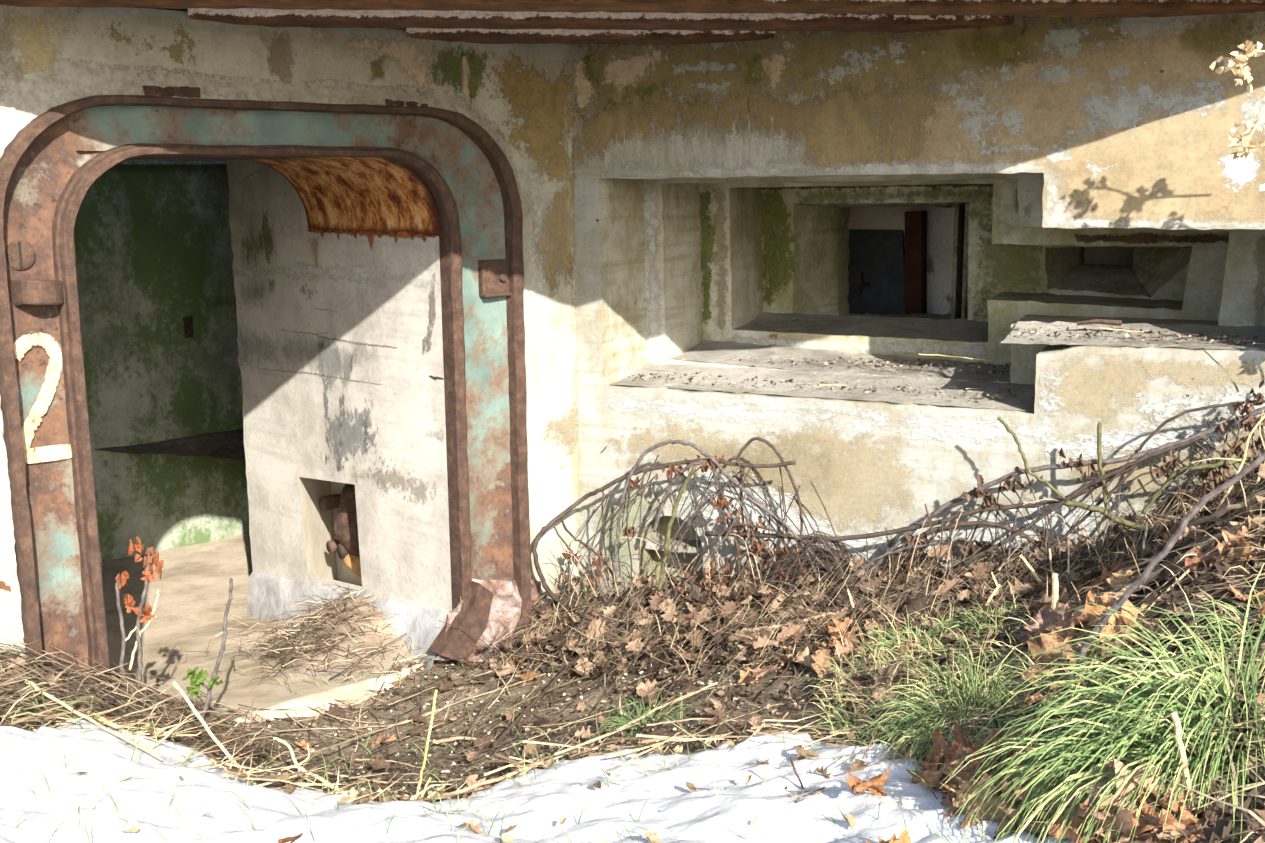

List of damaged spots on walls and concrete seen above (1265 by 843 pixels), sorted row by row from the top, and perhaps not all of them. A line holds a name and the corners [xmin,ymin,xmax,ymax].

corrosion [311,227,435,266]
leakage [188,0,1265,356]
peeling [940,24,1226,188]
spalling [1217,86,1265,192]